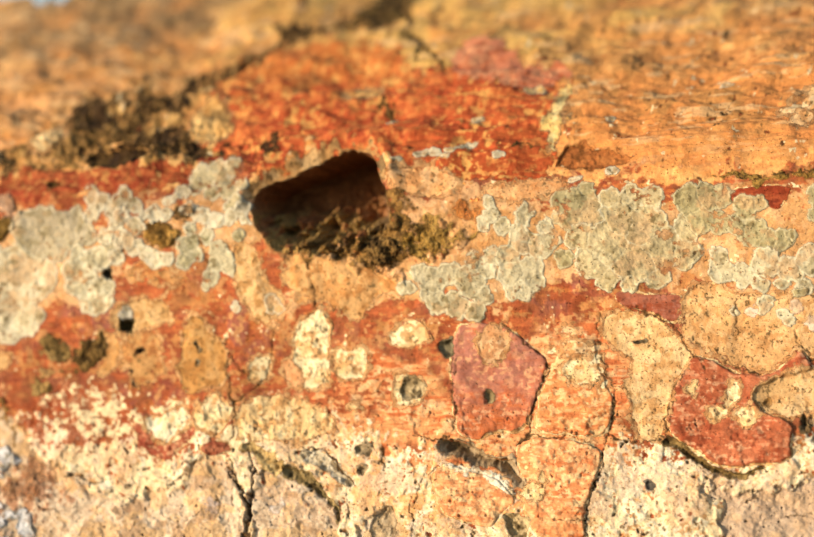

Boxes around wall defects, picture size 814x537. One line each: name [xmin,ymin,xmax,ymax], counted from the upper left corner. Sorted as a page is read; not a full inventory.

spalling [187,94,236,146]
spalling [540,80,578,153]
spalling [385,157,463,199]
crack [637,306,760,375]
crack [225,325,278,438]
crack [413,358,458,441]
crack [501,312,676,537]
crack [216,465,257,537]
crack [296,446,354,517]